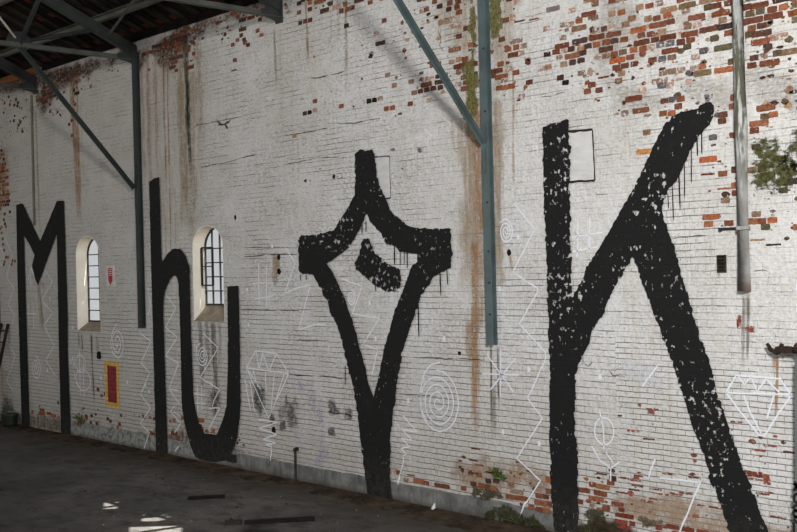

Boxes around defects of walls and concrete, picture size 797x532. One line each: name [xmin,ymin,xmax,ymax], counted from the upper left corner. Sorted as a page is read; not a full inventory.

peeling [143,6,267,73]
peeling [283,0,382,25]
peeling [366,0,478,119]
peeling [491,0,734,124]
peeling [744,0,797,134]
peeling [699,132,737,203]
rust [461,114,482,365]
peeling [702,214,737,235]
peeling [748,209,797,246]
peeling [458,448,552,514]
peeling [578,468,693,531]
peeling [743,435,795,496]